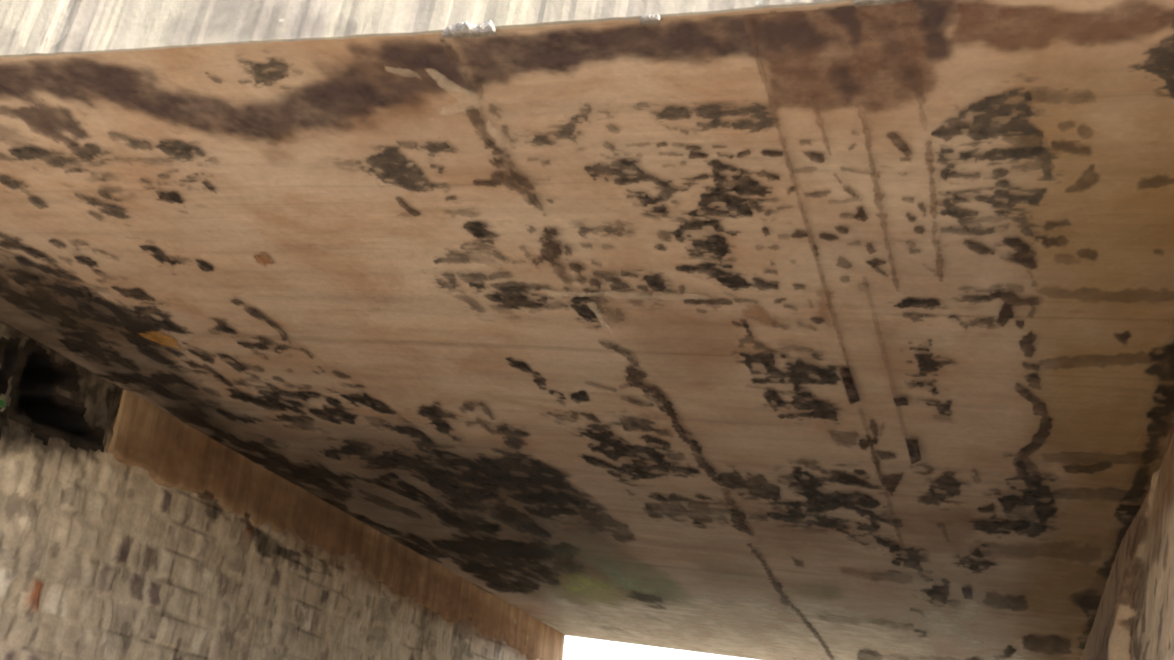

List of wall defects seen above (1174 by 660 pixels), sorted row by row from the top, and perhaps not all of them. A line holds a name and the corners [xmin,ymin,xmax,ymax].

water stain [0,17,828,146]
crack [446,81,605,303]
water stain [826,7,859,44]
water stain [1042,223,1067,248]
crack [506,342,834,660]
water stain [167,344,1174,660]